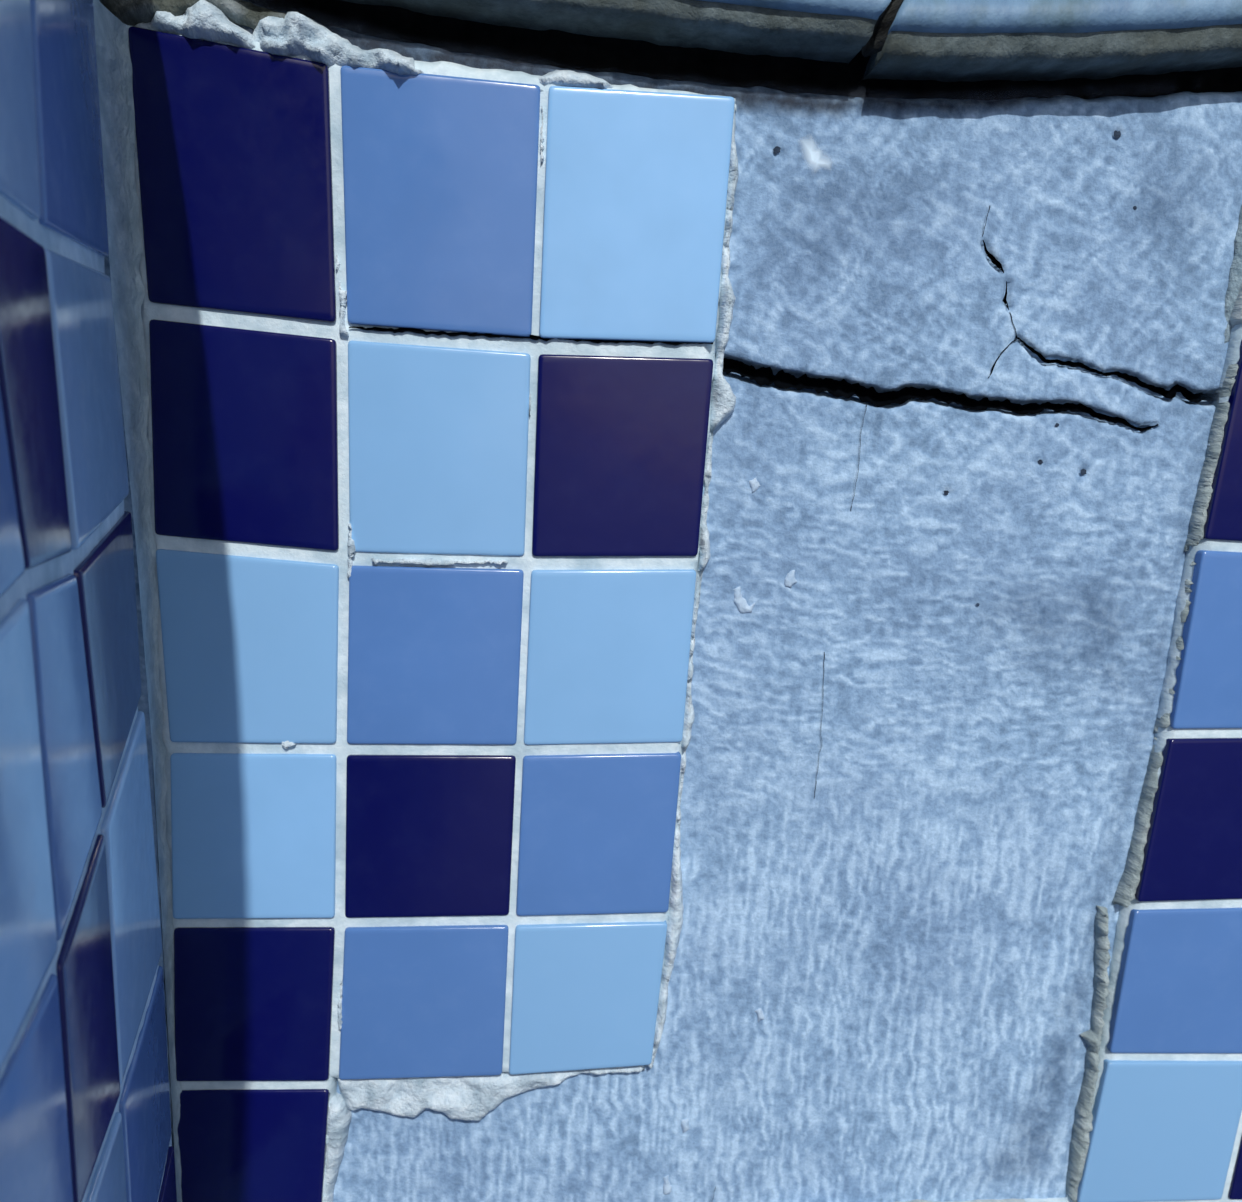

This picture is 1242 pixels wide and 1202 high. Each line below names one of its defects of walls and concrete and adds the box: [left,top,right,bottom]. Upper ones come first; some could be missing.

flaking render [399,41,443,62]
crack [259,0,1242,100]
crack [349,207,1217,511]
flaking render [113,312,165,999]
flaking render [333,64,1242,1202]